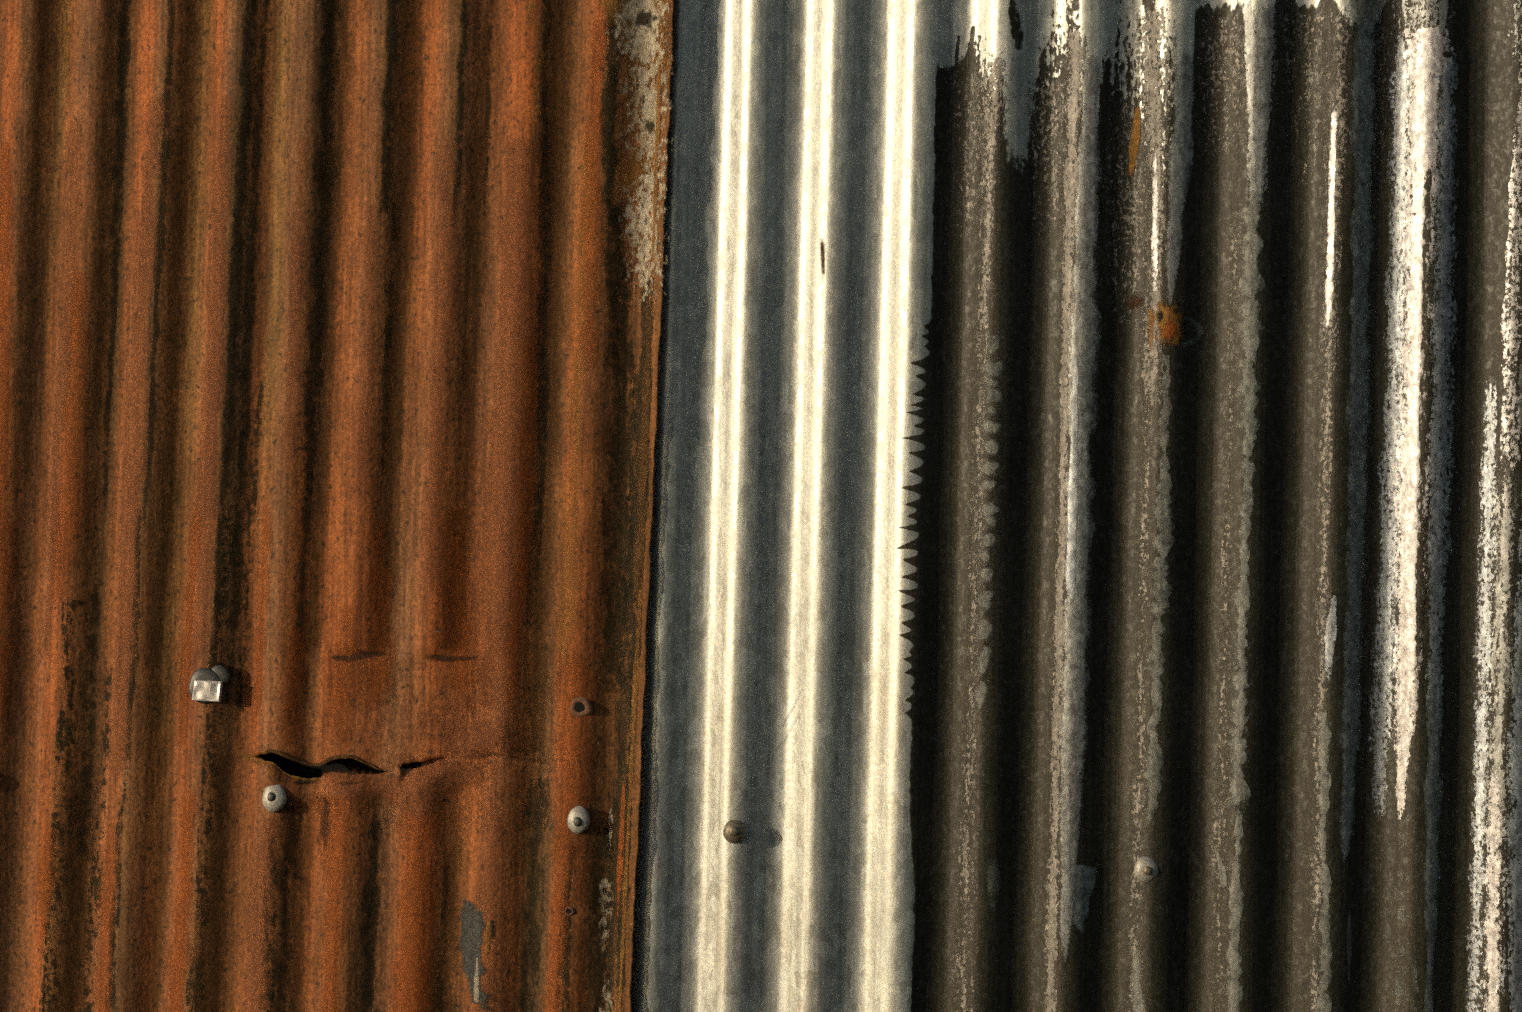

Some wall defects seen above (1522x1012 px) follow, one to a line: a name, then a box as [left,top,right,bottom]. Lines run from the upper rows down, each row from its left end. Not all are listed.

peeling [615,0,669,301]
rust [1129,297,1181,347]
rust [617,309,652,1012]
peeling [458,899,494,1010]